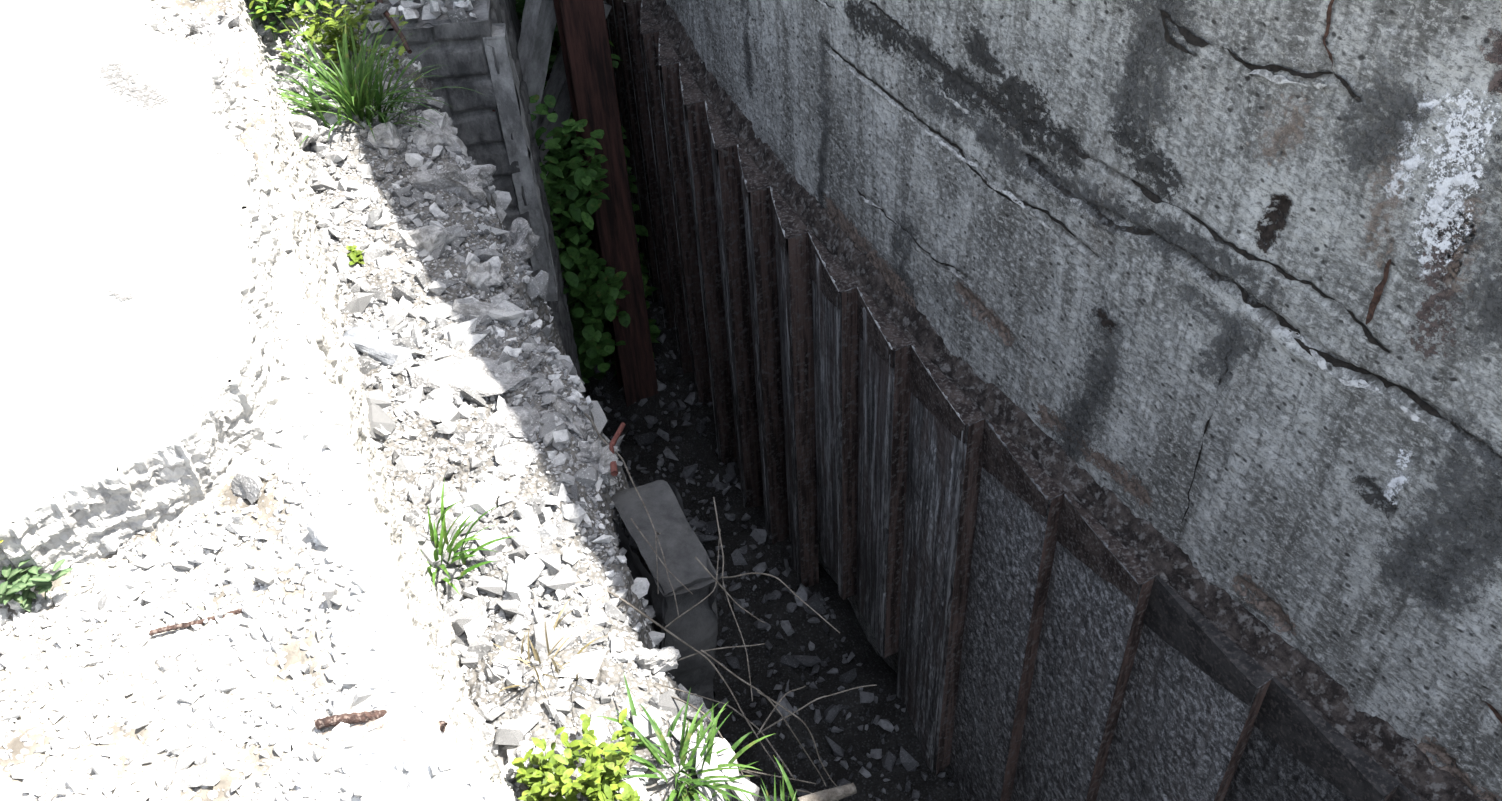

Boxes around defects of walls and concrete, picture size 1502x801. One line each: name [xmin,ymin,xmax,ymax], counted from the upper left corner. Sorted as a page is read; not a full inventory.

crack [868,0,1390,353]
damp [1101,0,1198,139]
damp [1335,62,1502,354]
crack [1181,350,1232,523]